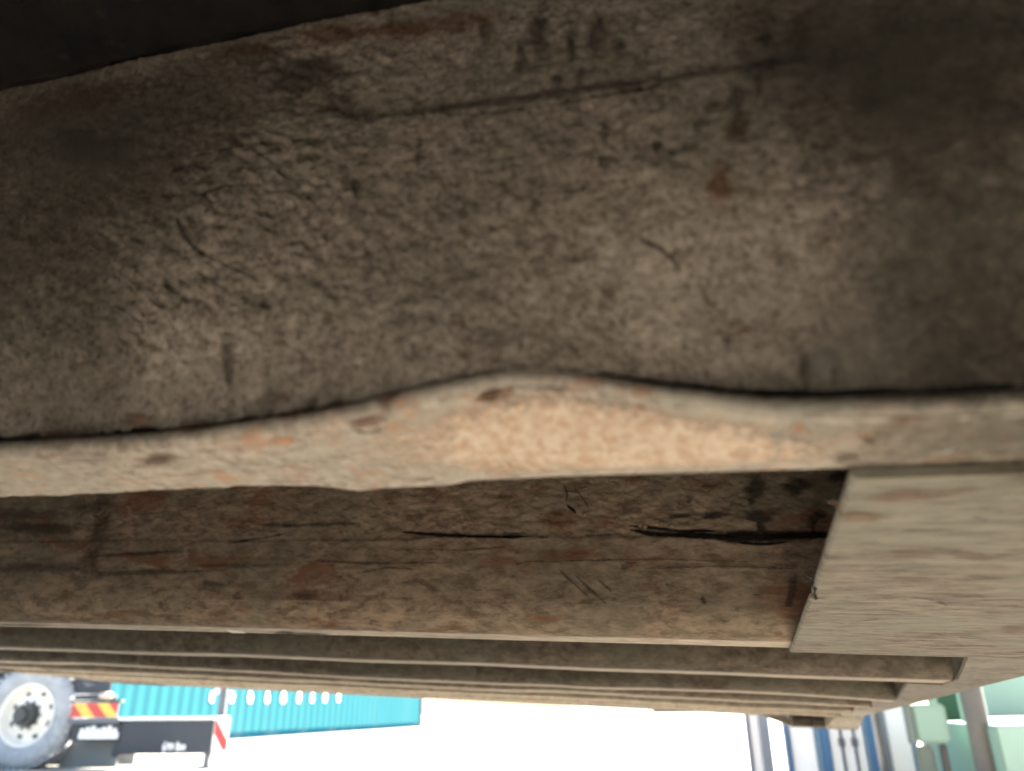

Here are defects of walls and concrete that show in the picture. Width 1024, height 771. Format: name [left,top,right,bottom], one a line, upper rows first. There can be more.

crack [564,486,829,546]
crack [230,523,357,543]
crack [403,531,544,539]